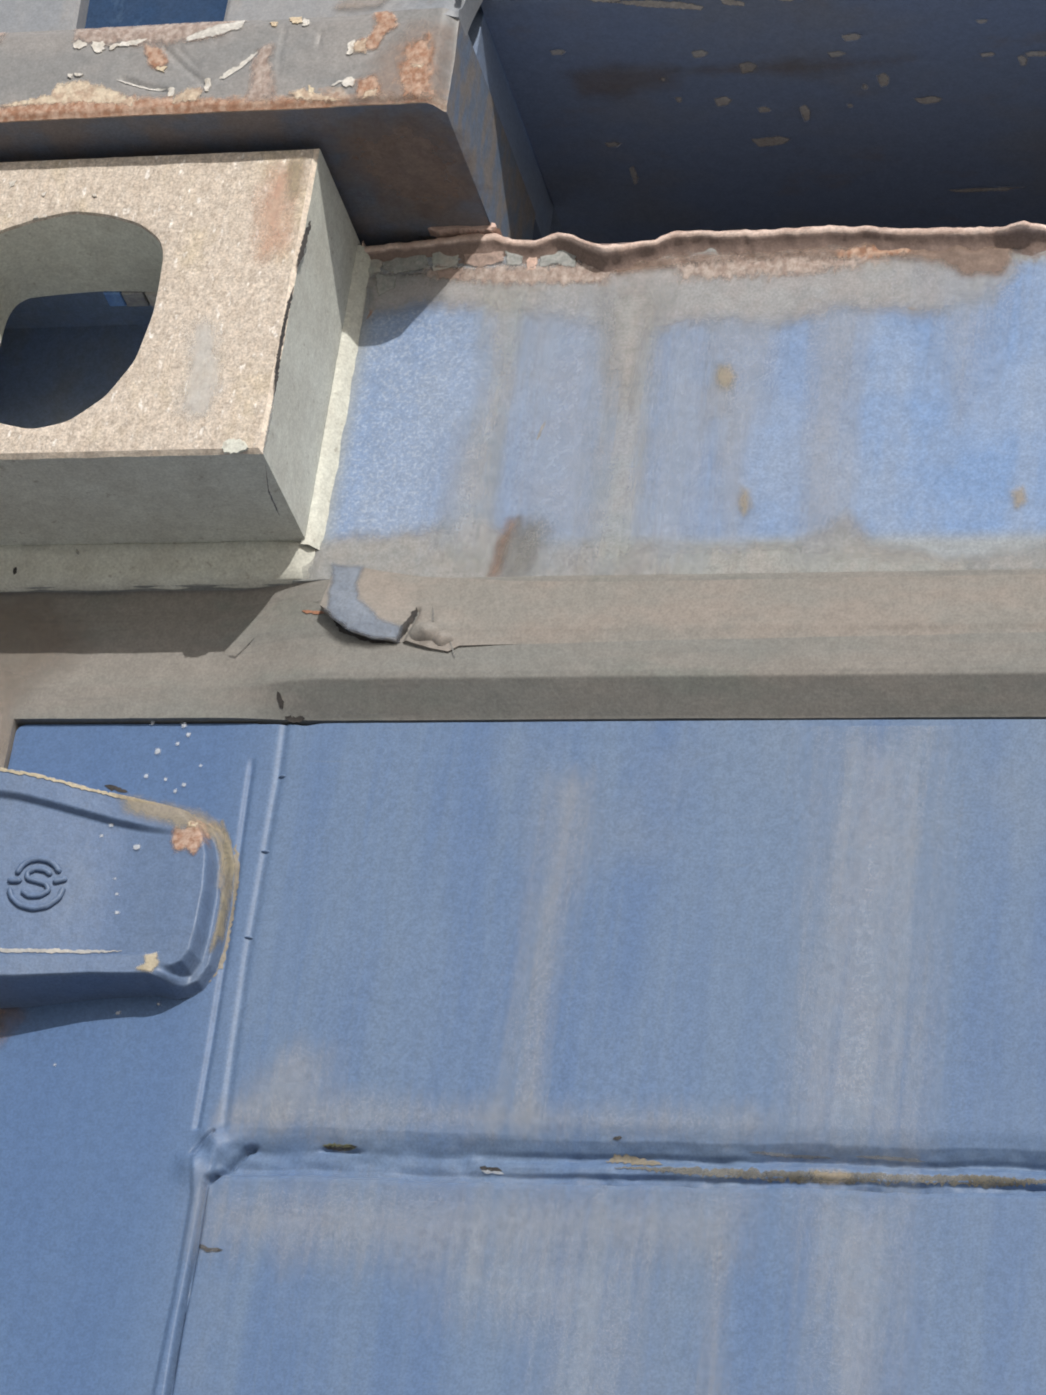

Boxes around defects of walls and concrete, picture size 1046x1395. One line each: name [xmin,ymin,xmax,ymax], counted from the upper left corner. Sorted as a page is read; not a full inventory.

peeling [73,20,245,54]
peeling [270,17,310,27]
peeling [591,0,703,11]
peeling [1,73,135,107]
peeling [168,78,211,104]
peeling [289,77,355,103]
rust [425,245,1011,285]
leakage [311,255,1046,579]
peeling [327,565,400,638]